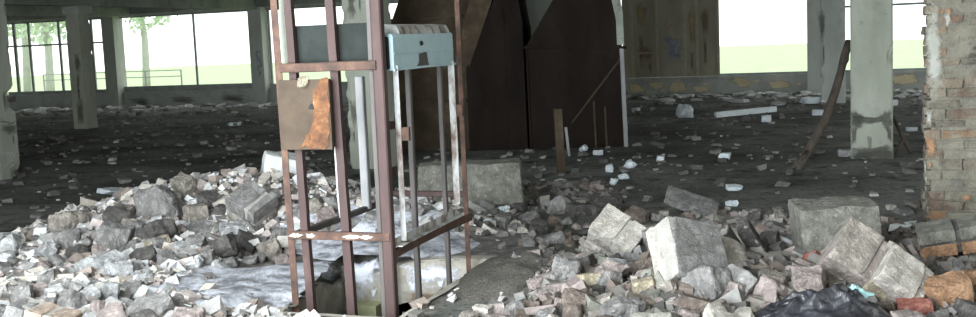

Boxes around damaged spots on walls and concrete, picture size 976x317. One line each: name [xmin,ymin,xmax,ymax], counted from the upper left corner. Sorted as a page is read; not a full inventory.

flaking render [928,32,940,77]
spalling [927,115,935,167]